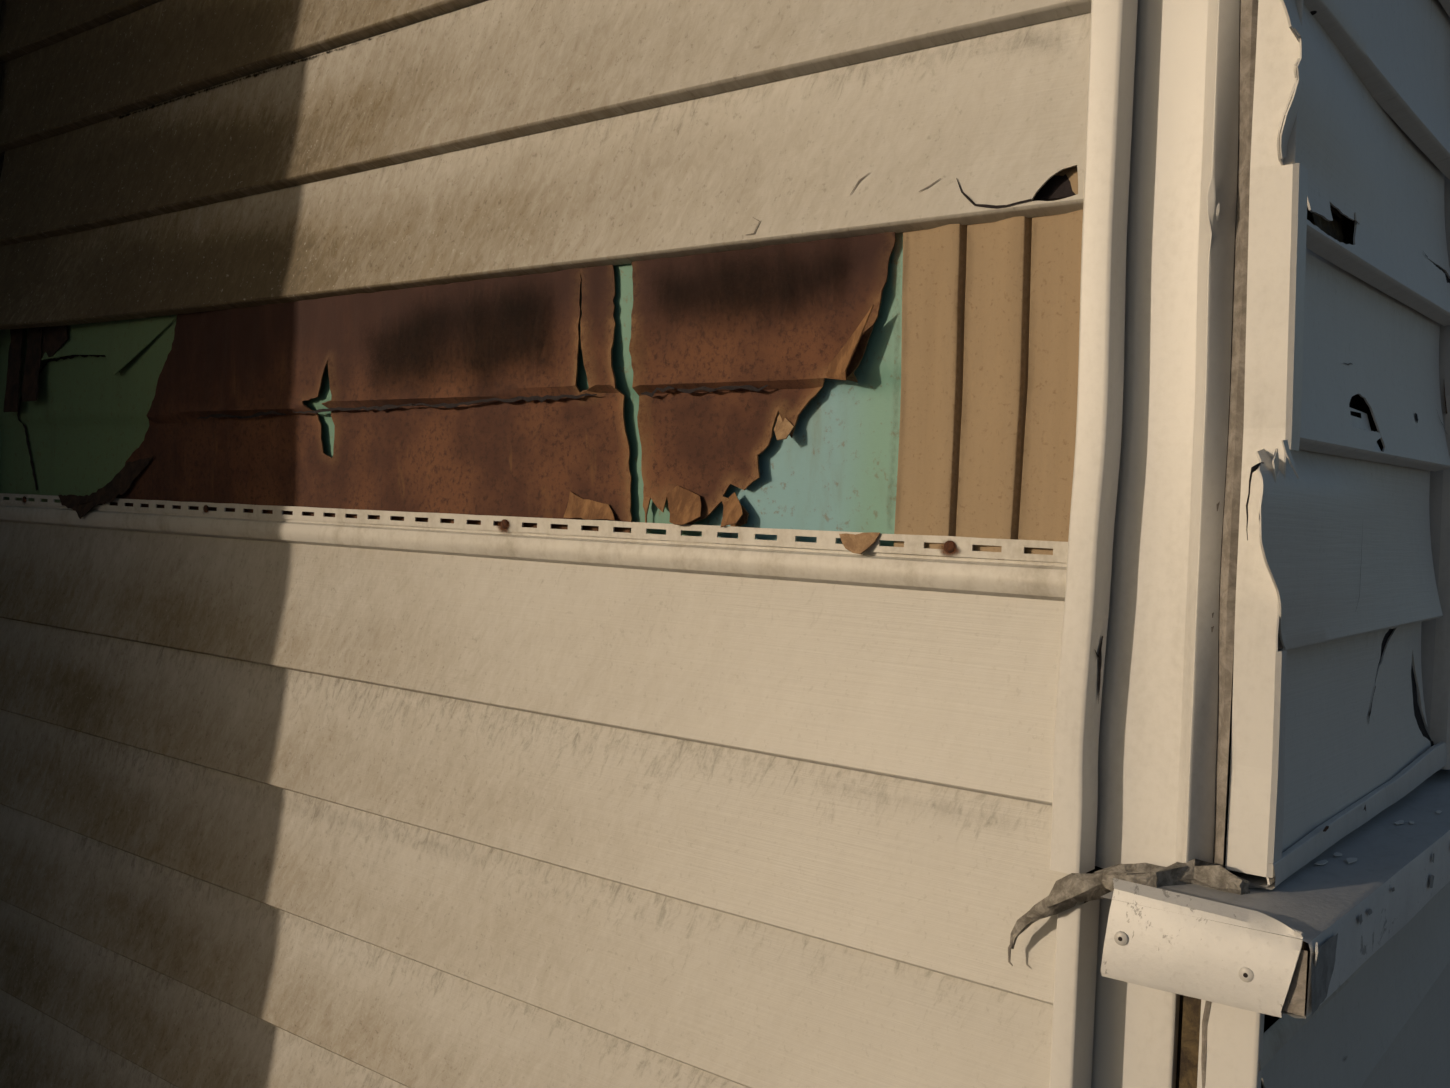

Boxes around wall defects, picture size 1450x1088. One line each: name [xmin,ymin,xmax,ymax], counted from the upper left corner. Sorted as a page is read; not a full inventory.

crack [1369,629,1434,747]